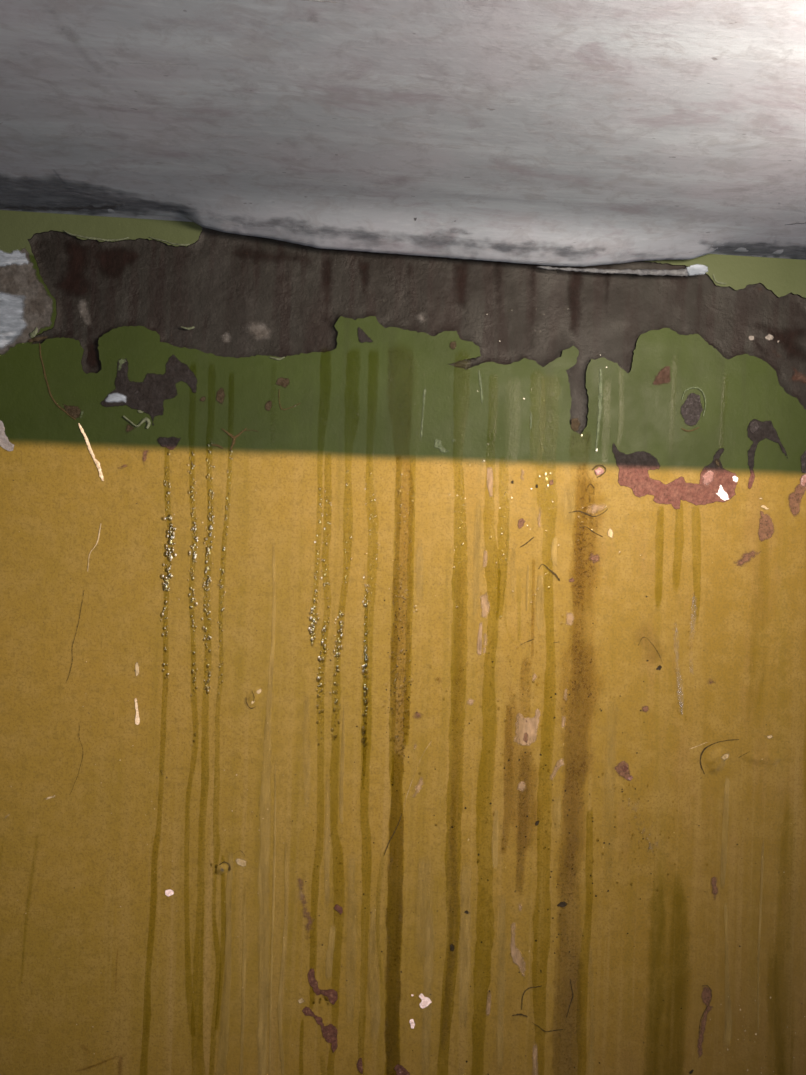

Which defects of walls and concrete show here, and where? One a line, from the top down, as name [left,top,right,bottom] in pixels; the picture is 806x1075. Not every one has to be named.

damp [0,177,186,214]
damp [304,228,378,240]
damp [556,247,587,256]
damp [713,243,806,260]
flaking render [0,227,806,434]
peeling [0,421,14,451]
peeling [157,437,181,450]
flaking render [586,419,787,566]
peeling [789,451,806,515]
peeling [569,505,613,538]
peeling [480,594,489,617]